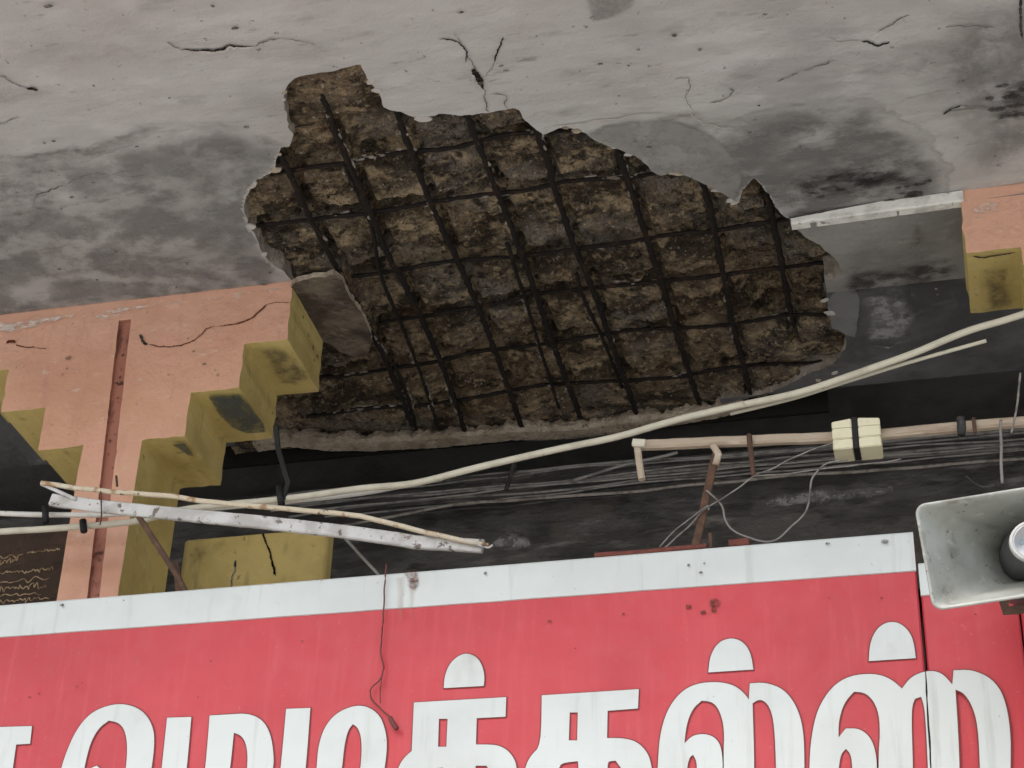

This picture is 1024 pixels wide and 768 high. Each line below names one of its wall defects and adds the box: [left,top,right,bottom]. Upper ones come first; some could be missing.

crack [168,38,315,54]
crack [443,33,508,113]
crack [777,15,909,82]
damp [727,117,932,216]
damp [0,139,271,315]
spalling [222,65,860,469]
crack [139,302,289,347]
crack [262,531,276,576]